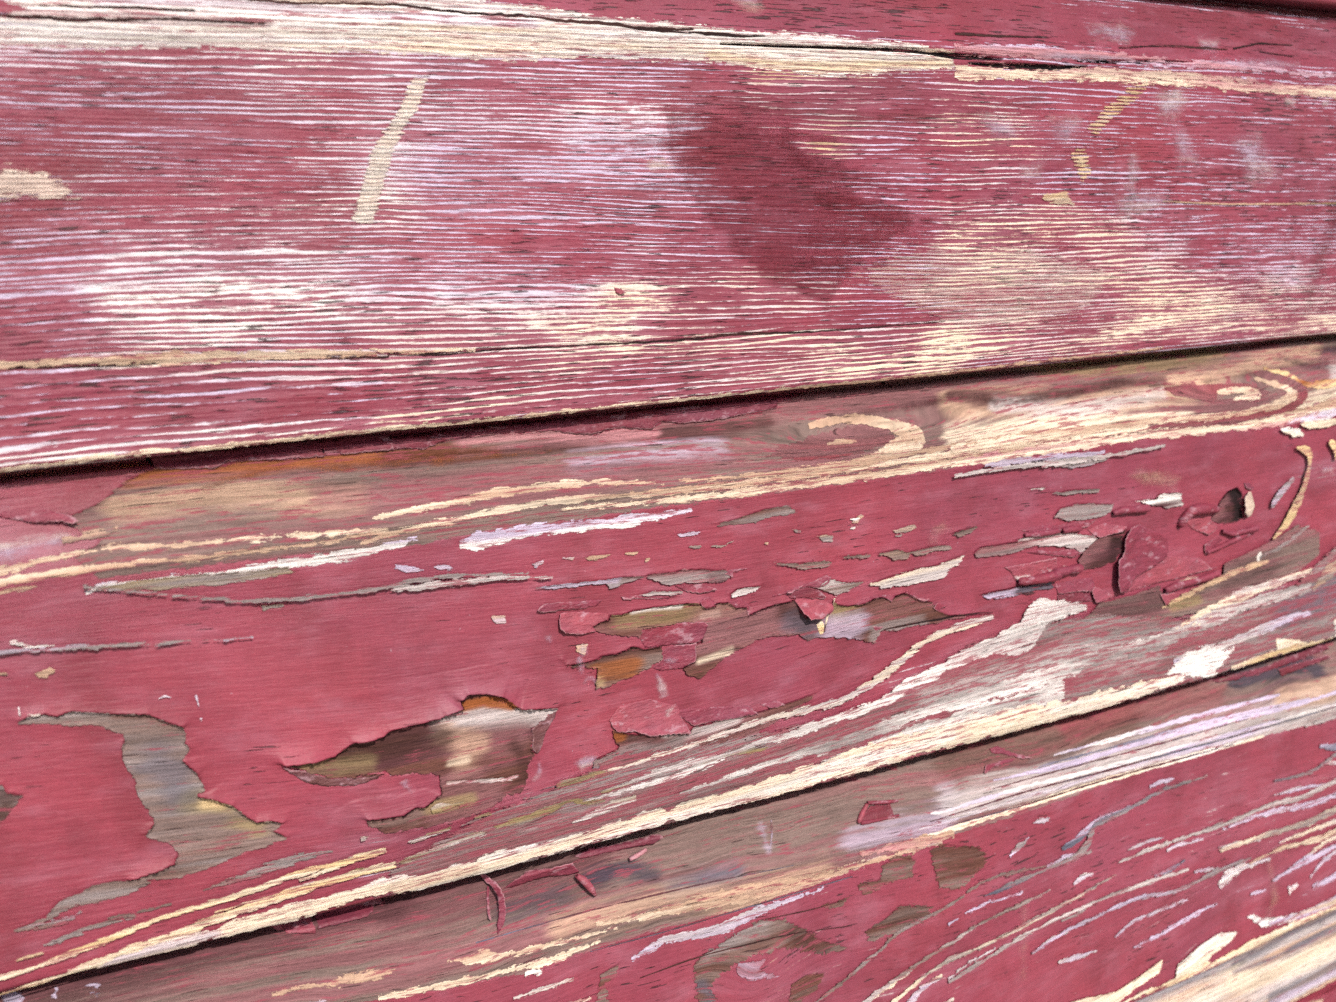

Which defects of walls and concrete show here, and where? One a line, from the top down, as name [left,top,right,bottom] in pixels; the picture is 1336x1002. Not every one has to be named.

crack [0,0,1293,72]
peeling [1281,418,1336,437]
peeling [394,564,452,573]
peeling [536,488,1259,690]
peeling [1192,643,1332,684]
peeling [284,694,558,833]
peeling [14,712,287,932]
peeling [857,800,900,825]
peeling [822,855,916,909]
peeling [930,844,987,892]
peeling [270,898,382,934]
peeling [1075,931,1237,1002]